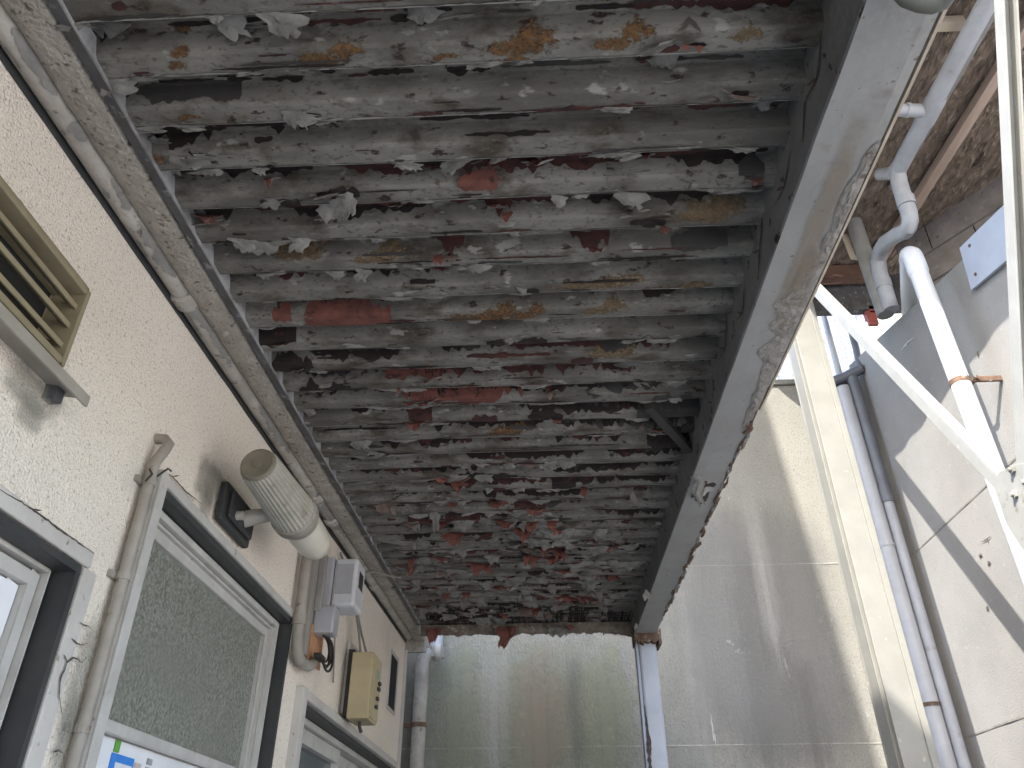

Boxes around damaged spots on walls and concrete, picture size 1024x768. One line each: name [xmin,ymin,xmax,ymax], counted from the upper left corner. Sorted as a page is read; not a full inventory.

peeling [52,0,475,43]
rust [481,17,557,63]
rust [594,14,656,51]
peeling [576,0,794,11]
peeling [93,54,414,105]
peeling [447,58,611,77]
peeling [412,89,783,137]
peeling [135,110,768,266]
rust [443,300,547,321]
peeling [254,230,716,649]
rust [663,401,763,616]
crack [59,623,89,715]